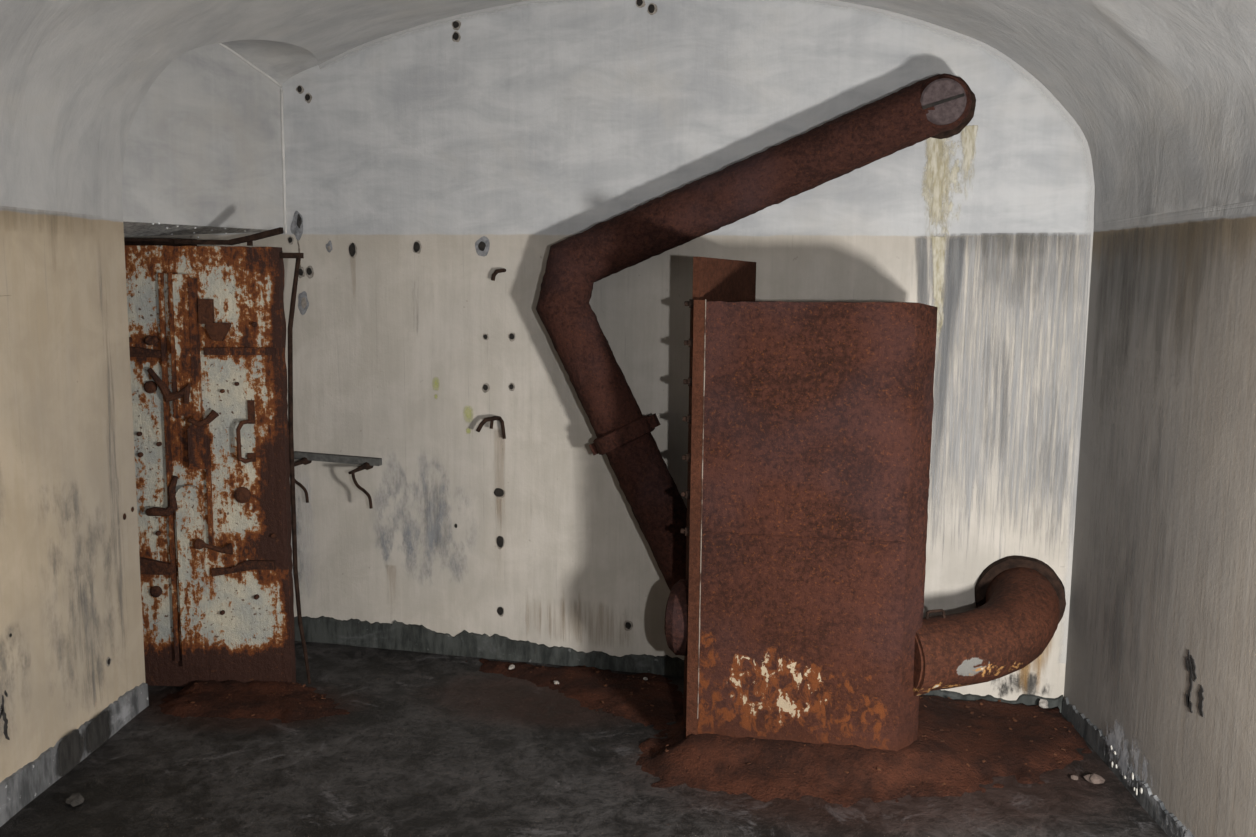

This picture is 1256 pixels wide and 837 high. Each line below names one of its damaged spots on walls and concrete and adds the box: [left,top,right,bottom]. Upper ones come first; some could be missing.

water stain [917,125,1091,528]
water stain [995,674,1045,695]